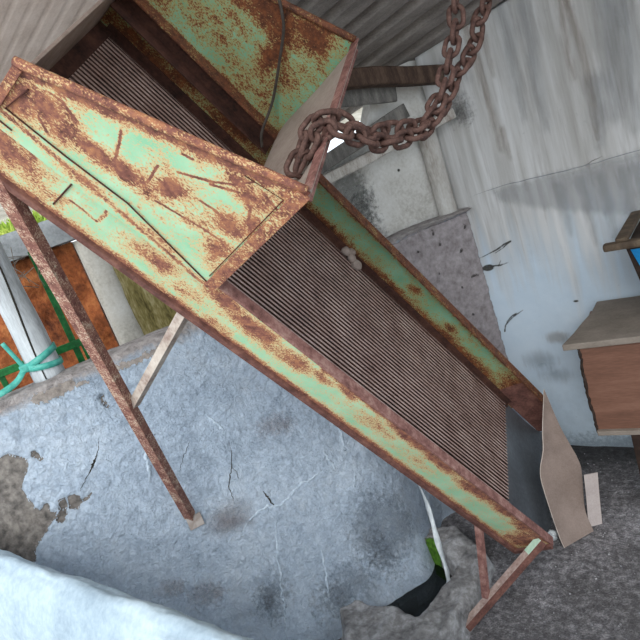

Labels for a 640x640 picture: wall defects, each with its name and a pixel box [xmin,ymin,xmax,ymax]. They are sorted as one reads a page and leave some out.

crack [476,150,639,195]
crack [80,442,99,491]
crack [228,444,239,499]
spalling [0,451,92,562]